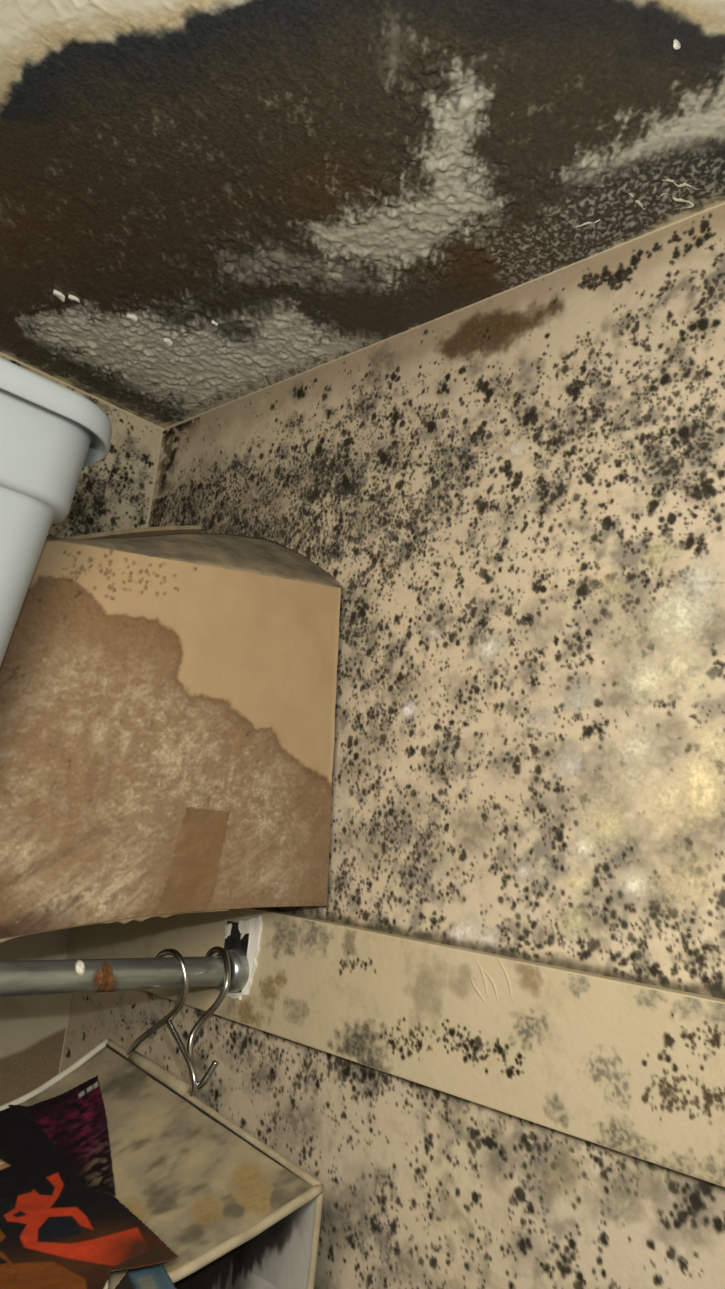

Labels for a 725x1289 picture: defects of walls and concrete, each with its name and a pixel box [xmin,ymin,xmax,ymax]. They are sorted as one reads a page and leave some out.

damp [0,0,725,999]
damp [0,1031,70,1106]
peeling [224,916,263,1000]
damp [105,999,725,1289]